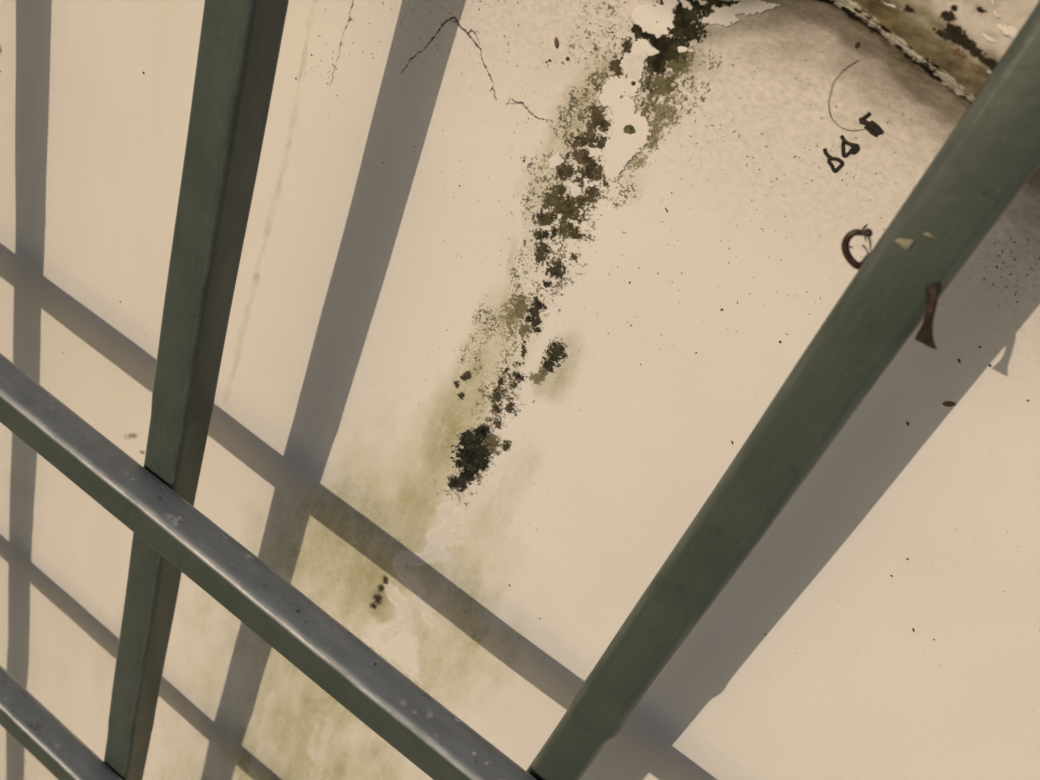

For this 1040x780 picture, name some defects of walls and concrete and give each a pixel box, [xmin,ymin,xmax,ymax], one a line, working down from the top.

crack [401,16,546,120]
water stain [774,0,998,134]
peeling [834,0,974,101]
peeling [981,0,1018,46]
water stain [453,0,741,450]
water stain [370,576,388,609]